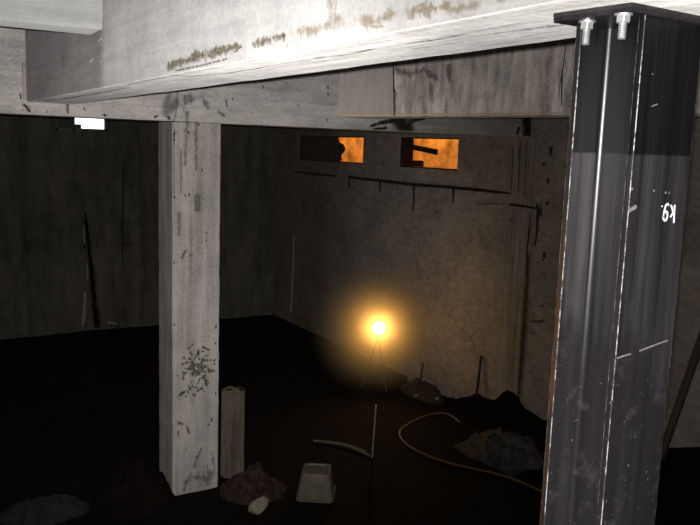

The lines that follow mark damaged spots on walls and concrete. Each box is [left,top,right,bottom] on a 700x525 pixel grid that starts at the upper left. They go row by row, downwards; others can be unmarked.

rust [412,2,449,19]
crack [84,213,100,328]